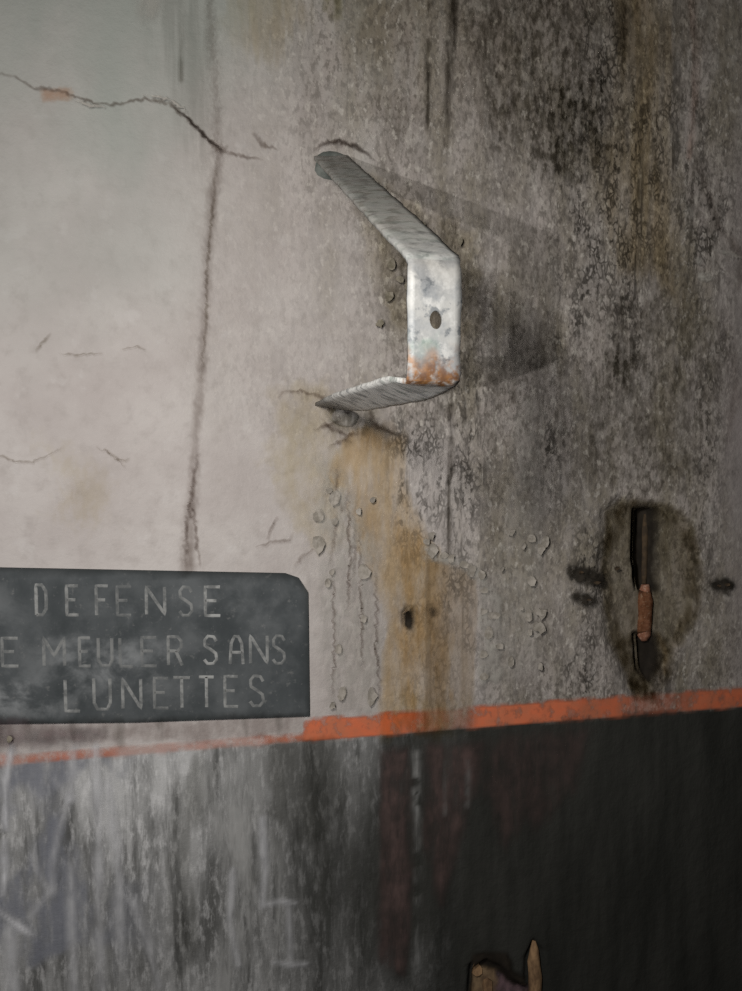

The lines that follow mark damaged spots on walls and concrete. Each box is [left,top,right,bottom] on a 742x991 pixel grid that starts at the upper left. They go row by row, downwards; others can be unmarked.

crack [152,95,212,143]
spalling [470,940,542,991]